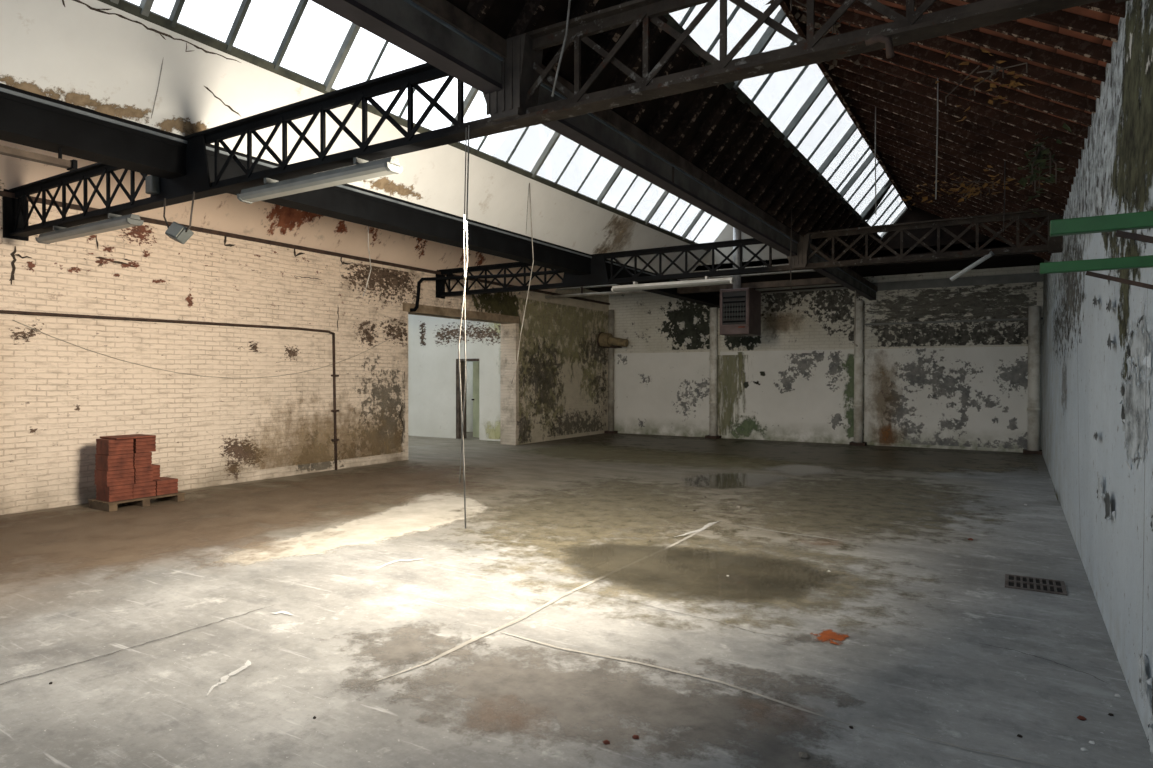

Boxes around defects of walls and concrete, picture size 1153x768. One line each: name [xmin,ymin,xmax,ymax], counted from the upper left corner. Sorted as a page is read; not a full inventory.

crack [62,0,241,118]
crack [9,246,31,285]
peeling [341,261,501,349]
peeling [674,378,710,419]
peeling [655,299,761,351]
damp [517,330,1038,474]
peeling [743,351,843,394]
peeling [761,289,1028,449]
peeling [1107,301,1153,476]
damp [0,356,488,571]
damp [484,531,894,627]
peeling [1138,646,1153,757]